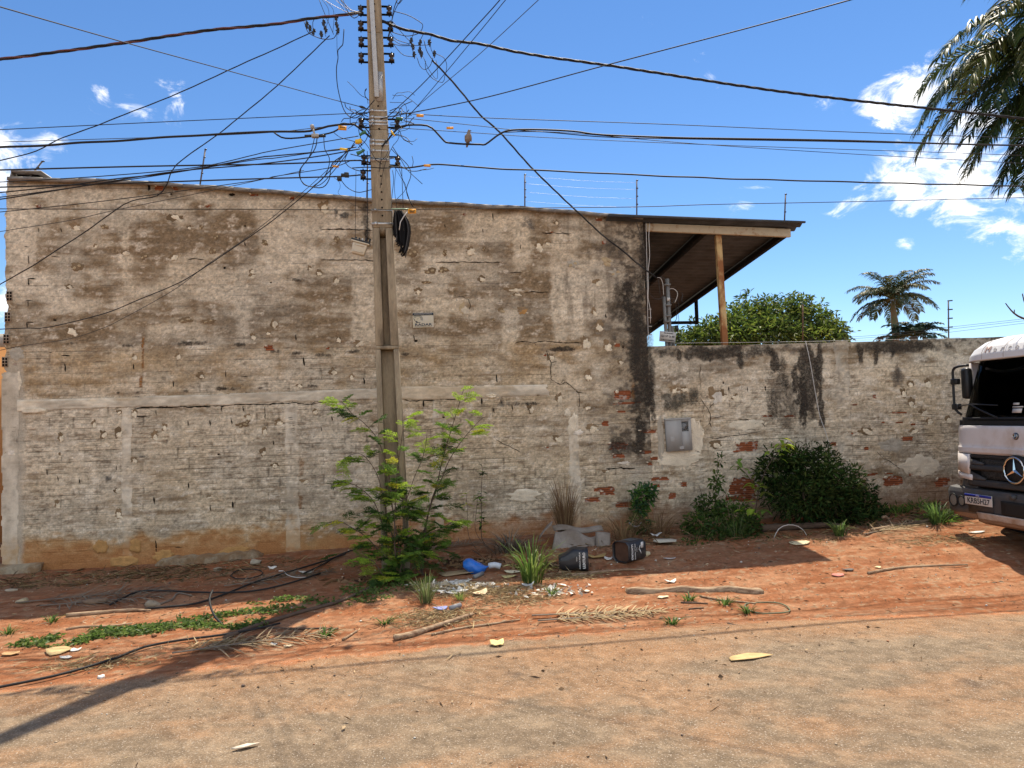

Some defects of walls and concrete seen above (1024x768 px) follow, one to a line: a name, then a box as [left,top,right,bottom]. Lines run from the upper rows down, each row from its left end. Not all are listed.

damp [610,225,825,455]
crack [516,341,582,406]
flaking render [700,430,758,453]
flaking render [584,442,687,508]
flaking render [726,477,764,502]